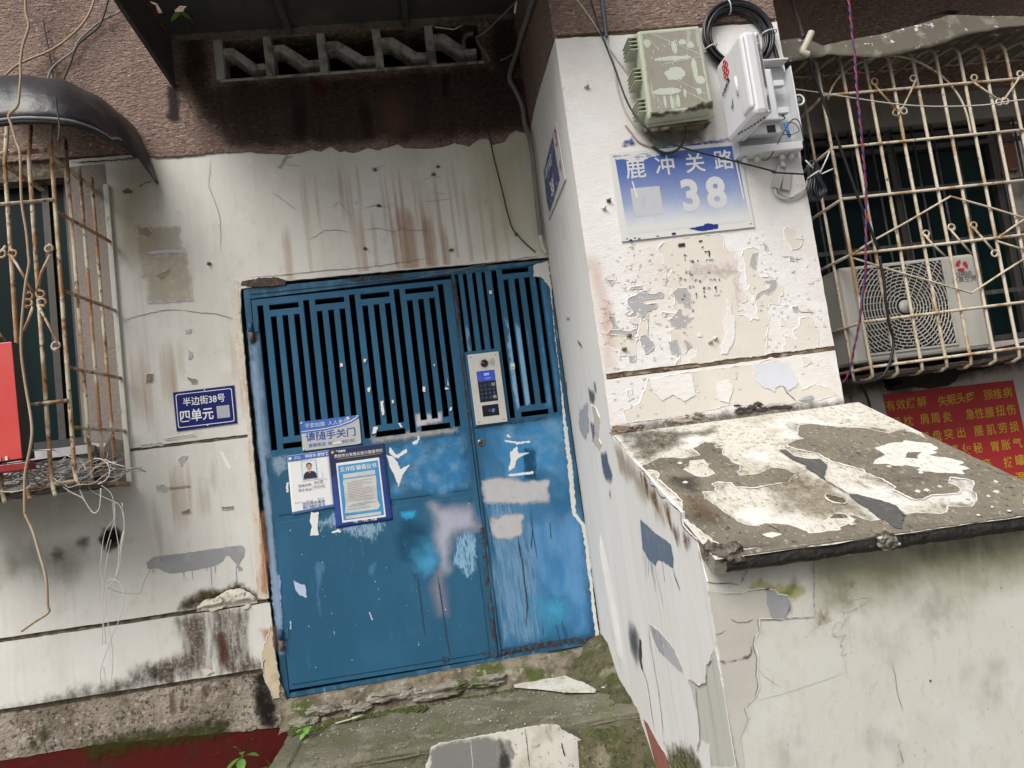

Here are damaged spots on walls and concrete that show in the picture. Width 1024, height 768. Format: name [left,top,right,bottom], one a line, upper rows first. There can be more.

crack [79,153,221,253]
peeling [591,227,837,451]
peeling [642,423,1024,564]
water stain [61,584,275,727]
flaking render [261,568,282,699]
crack [687,582,782,759]
peeling [643,718,671,768]